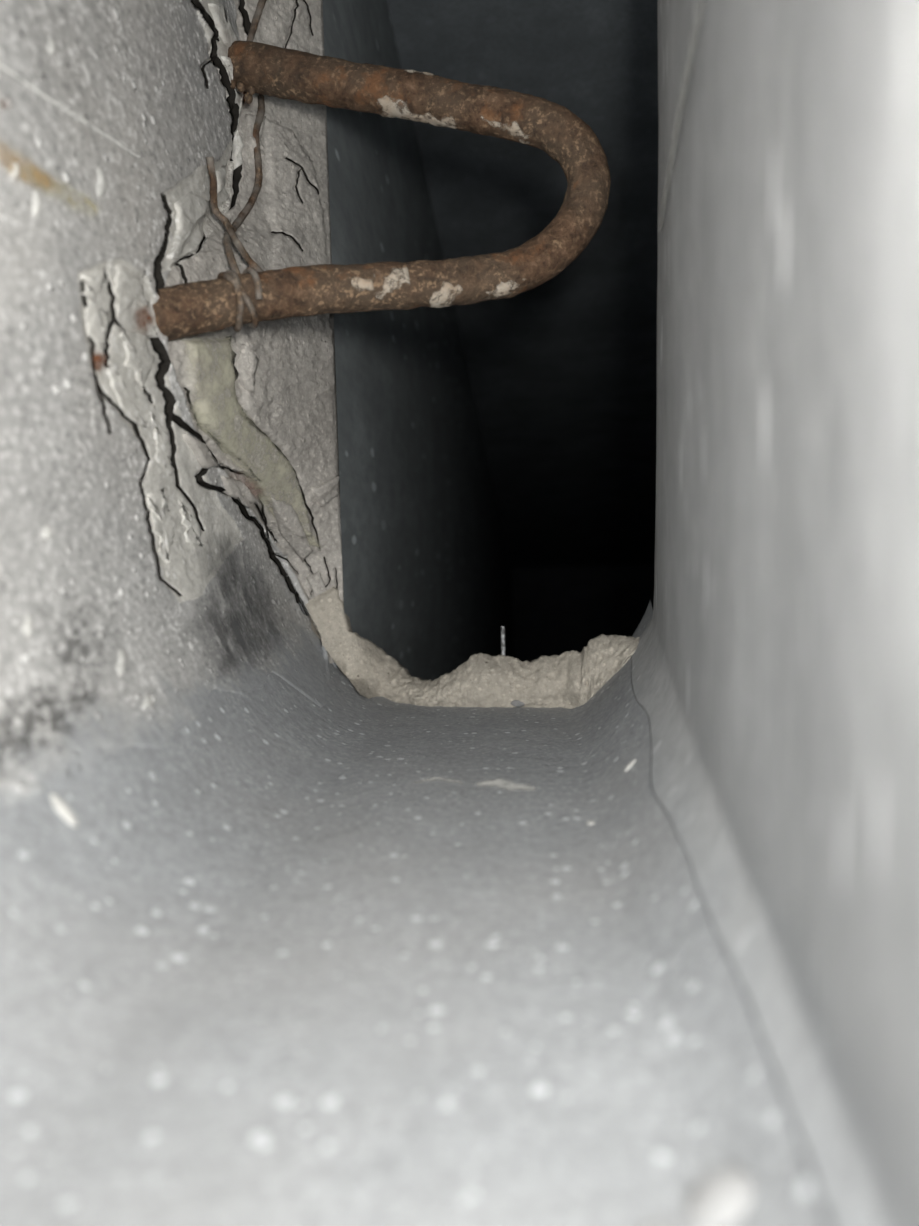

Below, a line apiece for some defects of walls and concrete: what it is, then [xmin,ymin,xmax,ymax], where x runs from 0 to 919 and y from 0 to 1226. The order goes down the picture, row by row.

crack [285,0,314,48]
crack [191,0,251,210]
corrosion [233,68,255,104]
crack [285,157,319,204]
crack [153,195,206,295]
crack [271,231,303,252]
spalling [78,0,344,603]
crack [80,273,338,616]